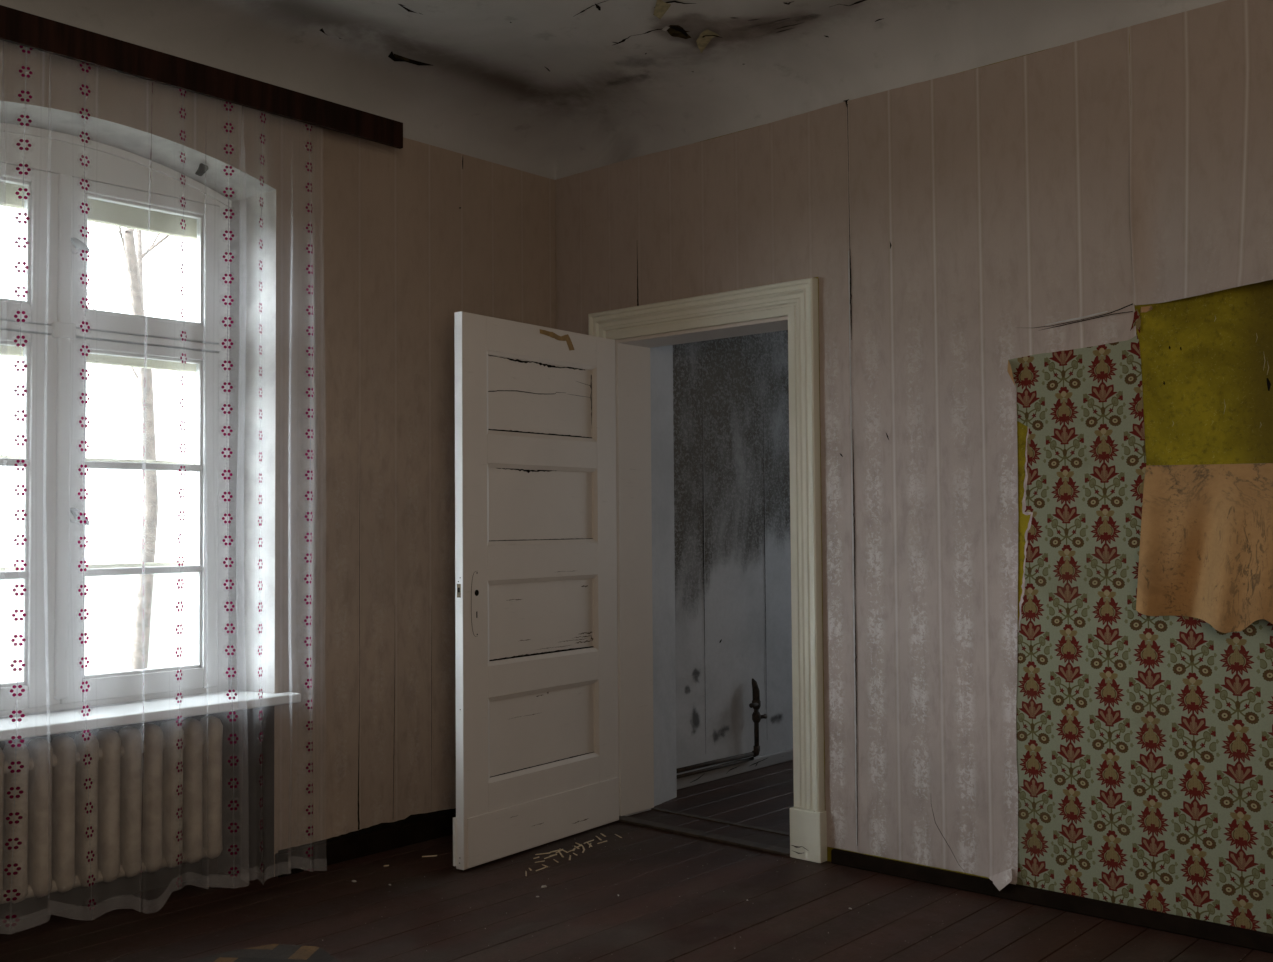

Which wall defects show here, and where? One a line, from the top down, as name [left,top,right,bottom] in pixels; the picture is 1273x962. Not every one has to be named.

crack [573,0,609,17]
peeling [1129,0,1273,465]
leakage [673,330,790,584]